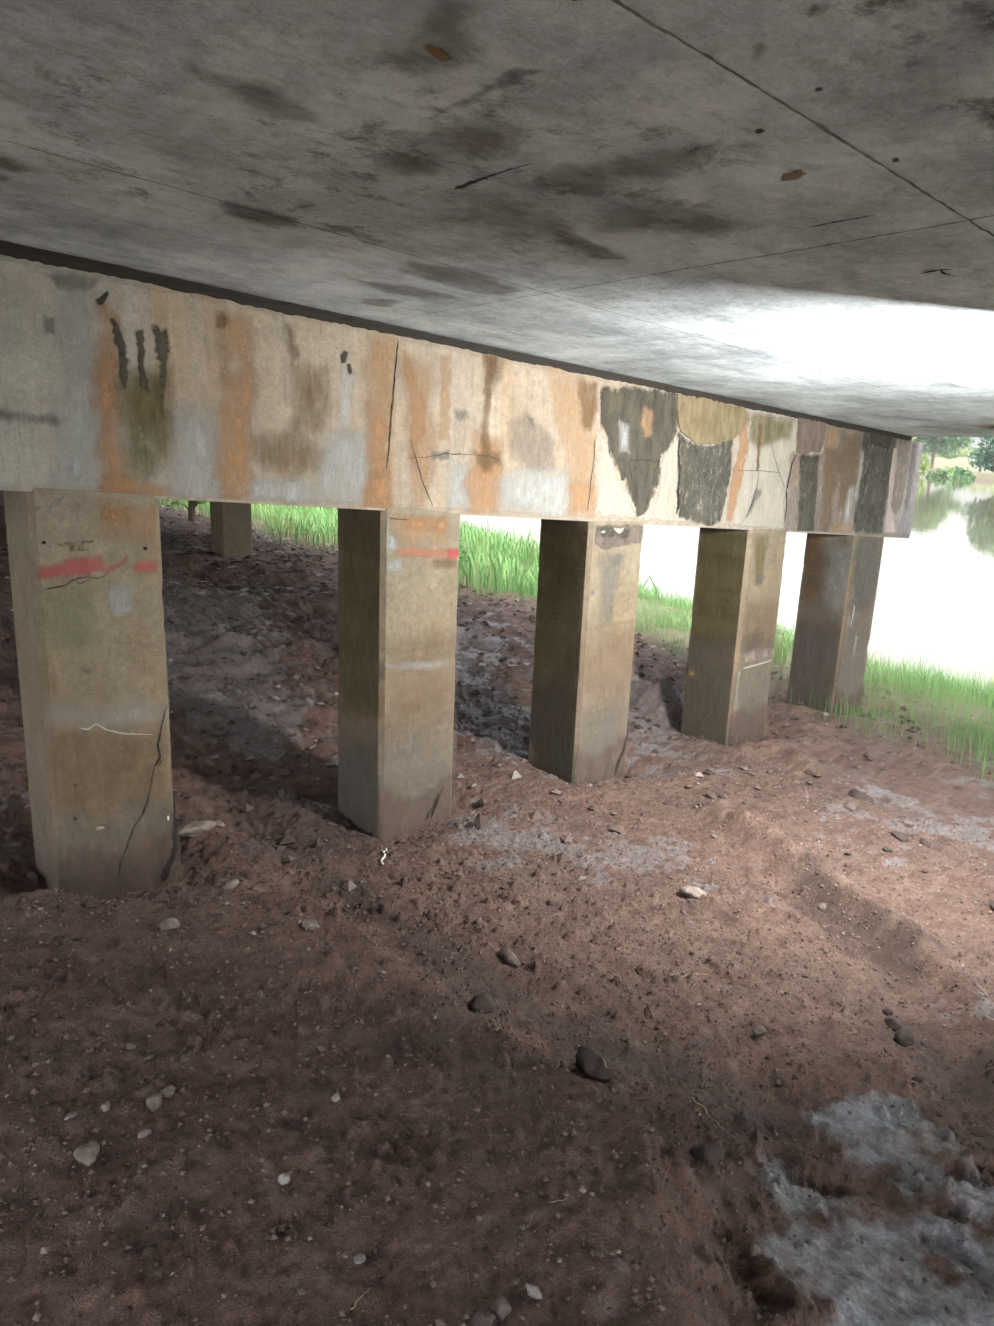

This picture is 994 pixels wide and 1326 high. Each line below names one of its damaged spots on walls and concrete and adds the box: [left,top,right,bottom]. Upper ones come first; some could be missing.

corrosion [782,170,806,181]
corrosion [95,291,169,496]
damp [111,318,170,420]
corrosion [466,357,501,510]
corrosion [559,379,597,511]
damp [600,387,678,516]
damp [790,426,892,710]
crack [118,705,178,883]